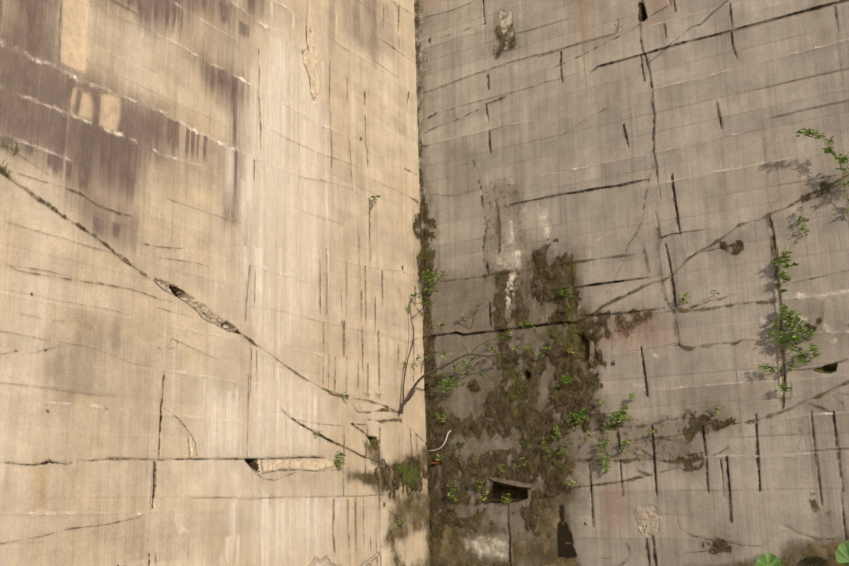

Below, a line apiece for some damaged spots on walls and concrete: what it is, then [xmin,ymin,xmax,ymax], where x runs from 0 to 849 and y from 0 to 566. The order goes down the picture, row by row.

spalling [638,2,647,21]
spalling [499,11,515,50]
water stain [0,0,328,334]
crack [0,167,167,310]
crack [281,0,849,566]
water stain [438,184,580,559]
spalling [814,363,837,373]
crack [6,458,64,466]
crack [162,443,323,480]
spalling [245,458,335,472]
spalling [481,484,528,504]